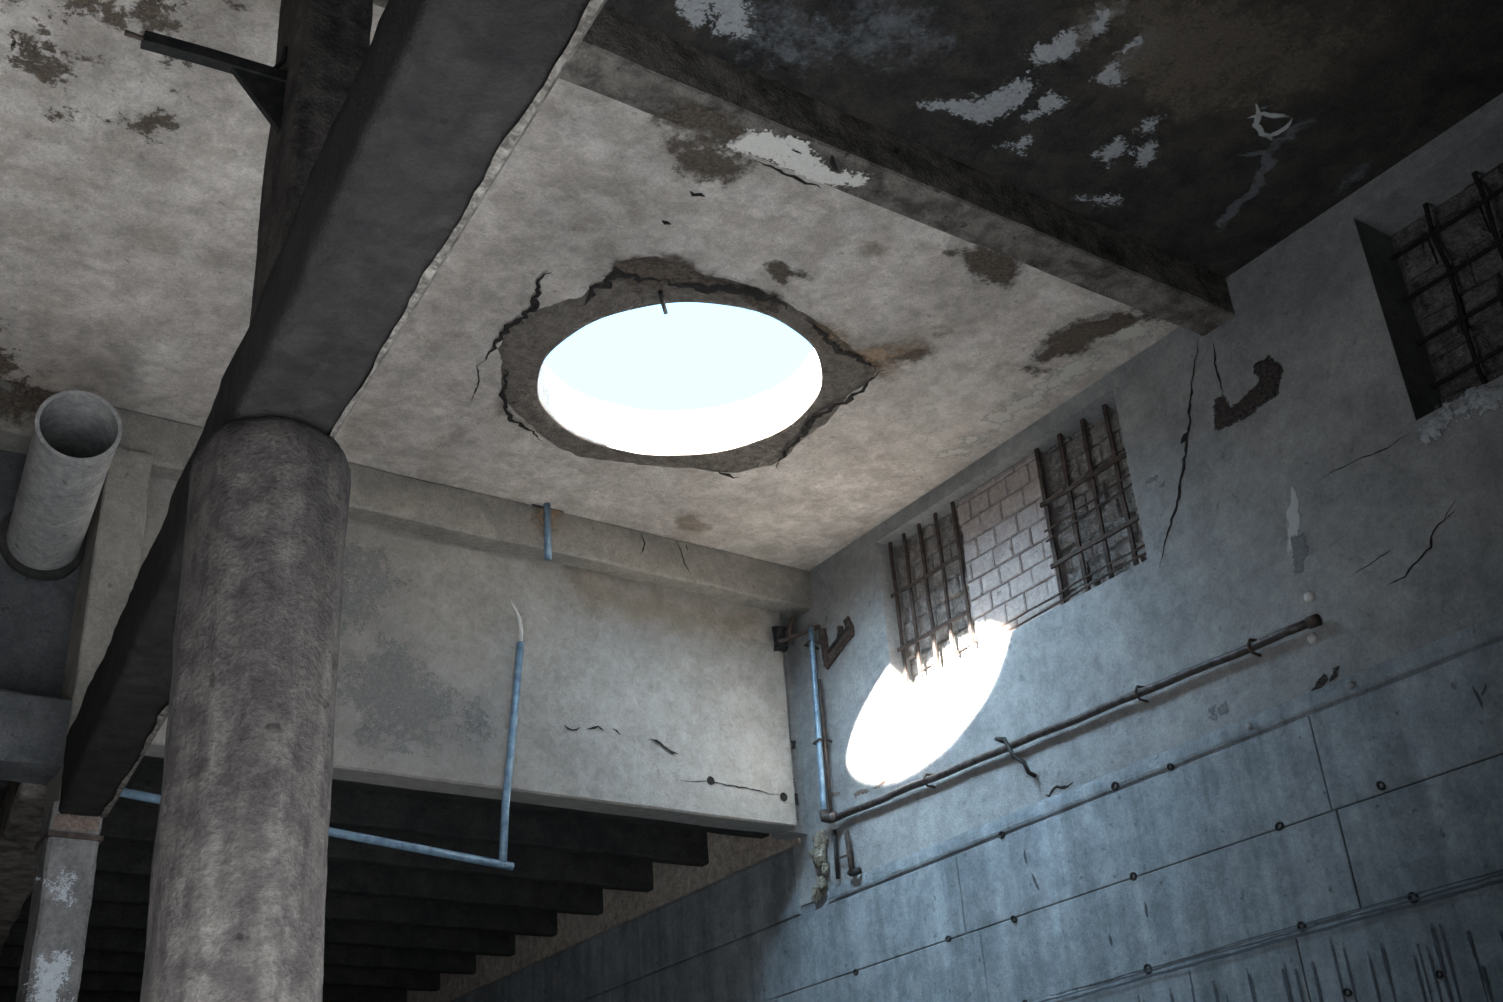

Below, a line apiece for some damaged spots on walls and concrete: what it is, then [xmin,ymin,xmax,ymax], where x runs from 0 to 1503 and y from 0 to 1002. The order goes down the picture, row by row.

peeling [5,0,211,122]
peeling [916,0,1128,157]
peeling [1089,34,1144,87]
peeling [106,107,179,144]
flaking render [726,128,870,190]
peeling [1089,114,1168,169]
crack [471,272,552,441]
crack [583,267,884,467]
spalling [1213,354,1284,431]
crack [1160,335,1222,563]
crack [1354,500,1456,585]
peeling [24,947,76,1002]